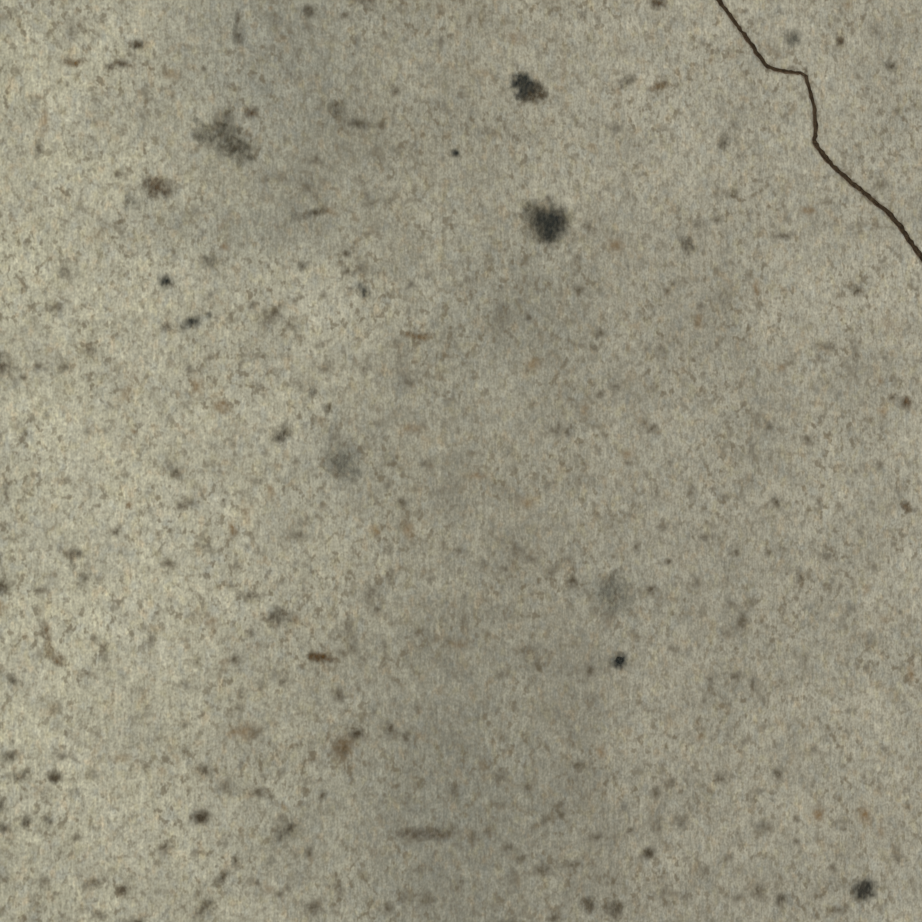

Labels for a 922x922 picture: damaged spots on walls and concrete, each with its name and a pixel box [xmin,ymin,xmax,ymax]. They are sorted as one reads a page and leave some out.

crack [716,0,922,262]